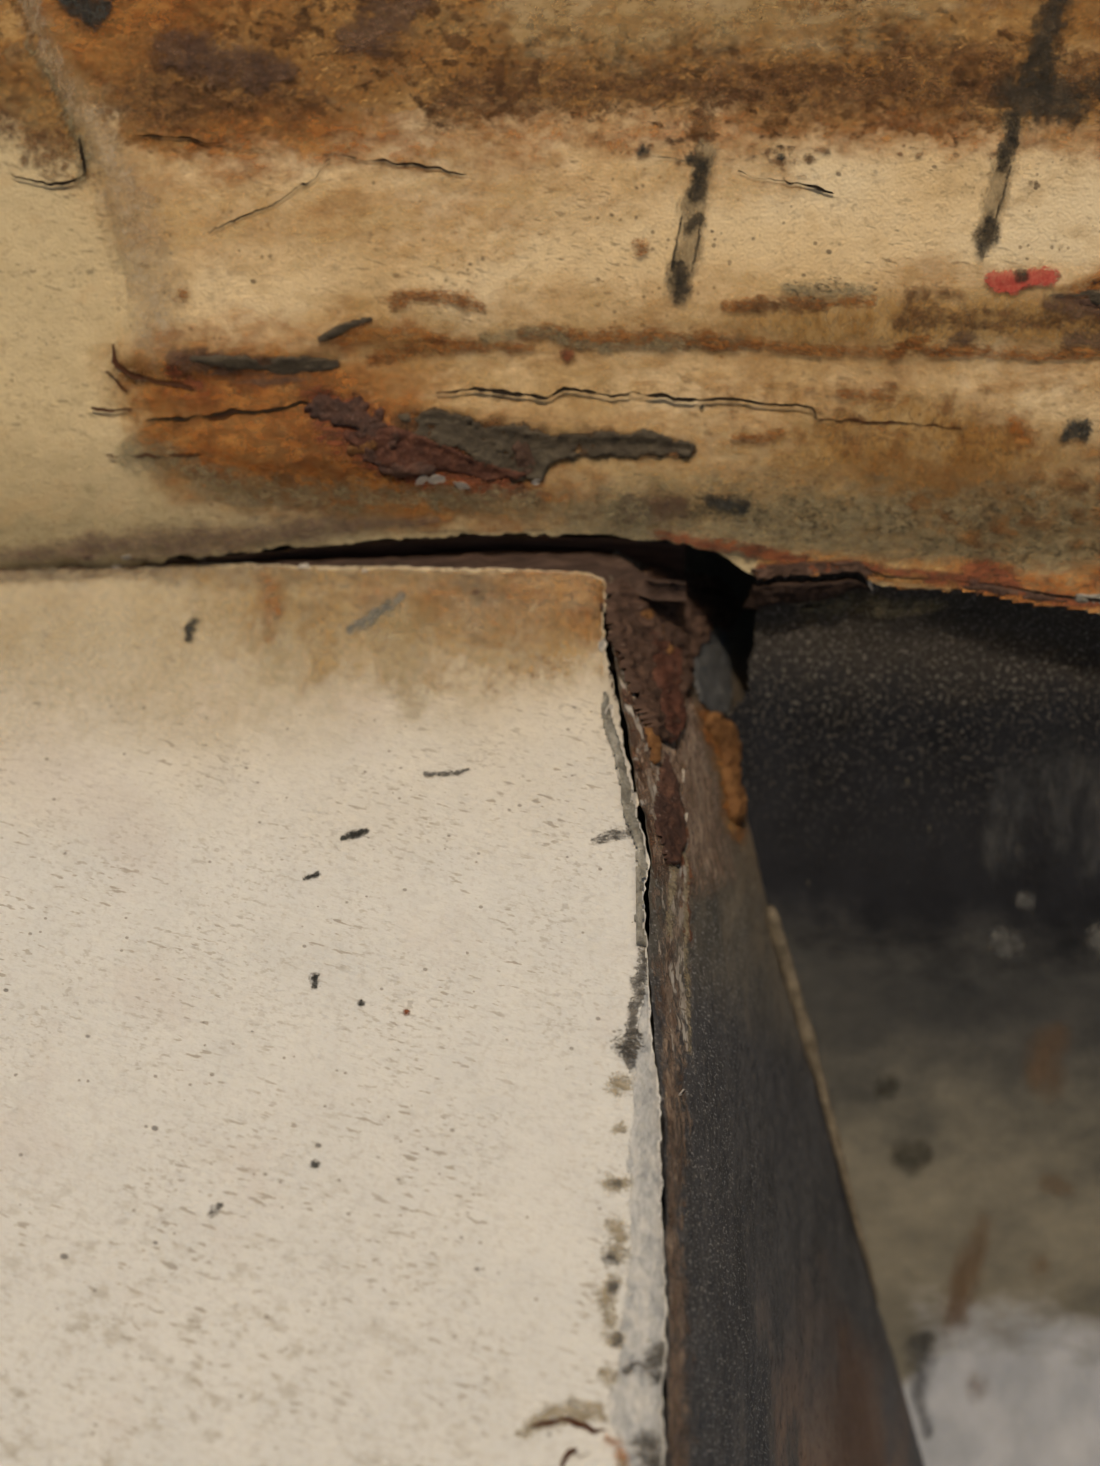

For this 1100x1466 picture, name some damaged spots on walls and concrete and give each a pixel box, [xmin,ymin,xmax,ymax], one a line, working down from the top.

crack [136,134,269,151]
crack [210,153,466,232]
damp [0,0,1100,303]
rust [753,132,830,177]
spalling [1048,280,1100,310]
spalling [165,317,697,496]
rust [0,270,1100,588]
crack [437,386,959,428]
crack [0,534,686,674]
spalling [692,627,733,716]
rust [605,528,1100,1466]